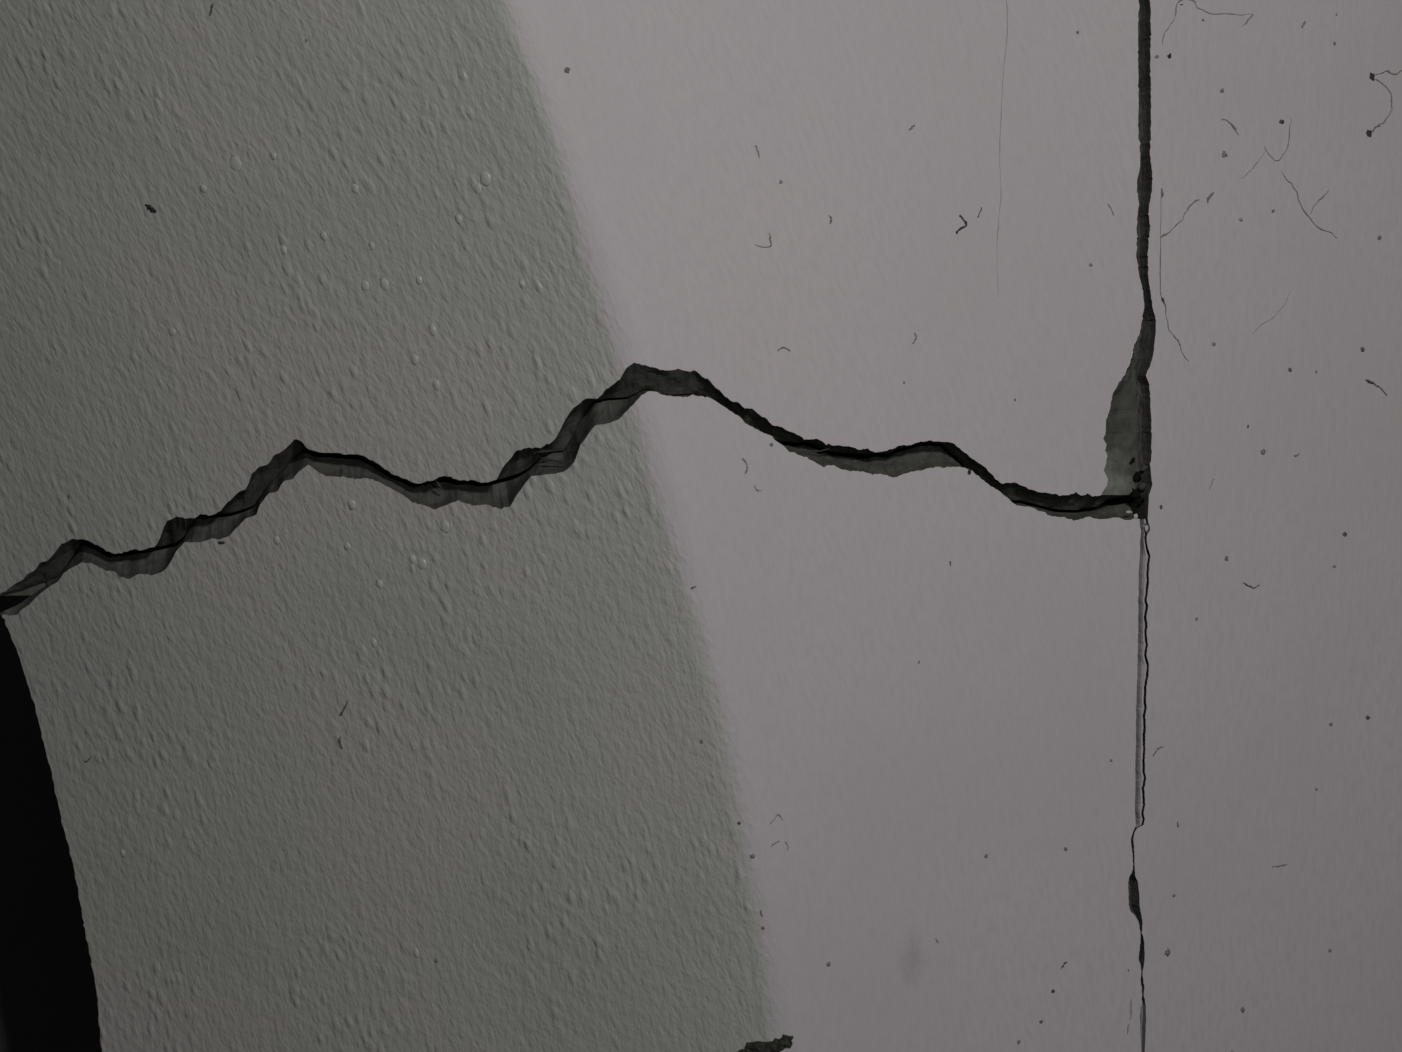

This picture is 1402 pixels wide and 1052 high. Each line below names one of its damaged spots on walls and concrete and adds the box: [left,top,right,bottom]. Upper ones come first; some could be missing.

crack [1160,224,1189,362]
crack [0,0,1156,1003]
peeling [738,1034,794,1052]